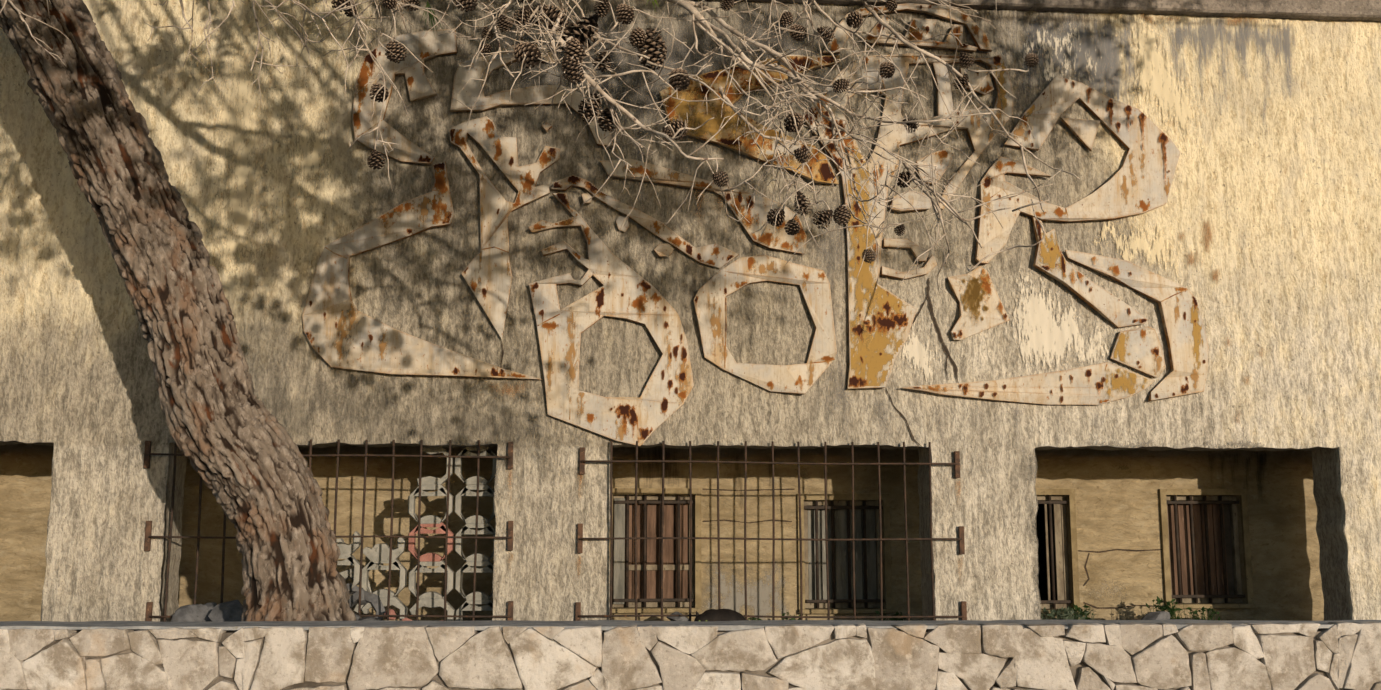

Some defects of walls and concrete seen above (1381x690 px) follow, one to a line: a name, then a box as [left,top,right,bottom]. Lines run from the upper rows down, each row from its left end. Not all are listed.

rust [789,39,840,72]
leakage [965,1,1132,108]
leakage [1173,18,1295,87]
rust [653,67,908,390]
rust [953,269,1008,339]
crack [1078,549,1162,609]